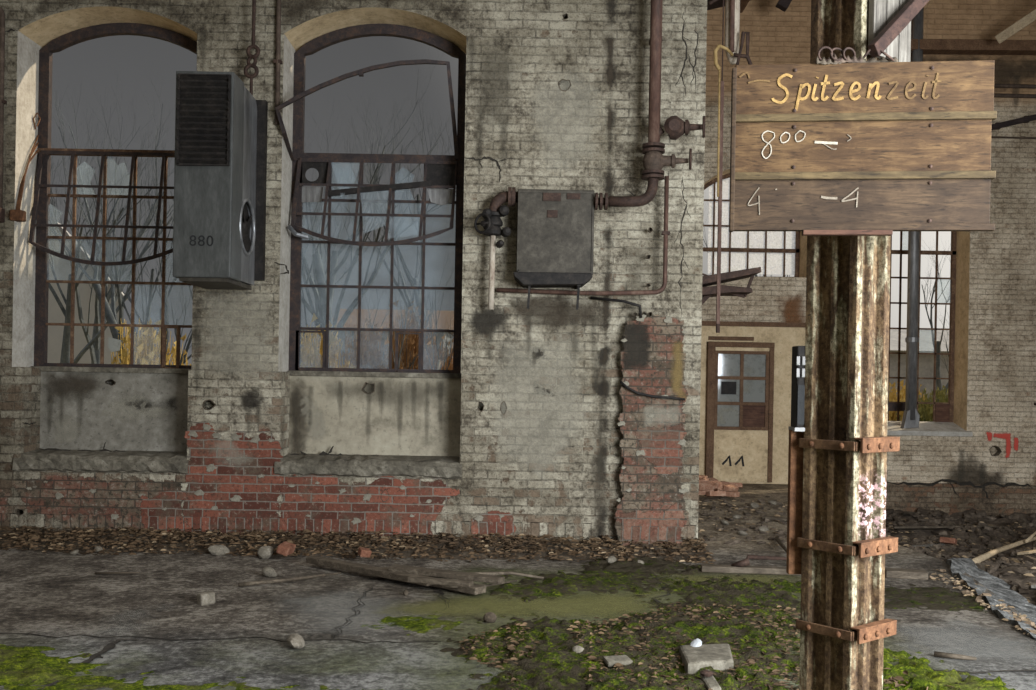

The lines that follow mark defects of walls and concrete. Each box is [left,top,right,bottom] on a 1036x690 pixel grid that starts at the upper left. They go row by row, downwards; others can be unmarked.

damp [48,375,95,395]
spalling [12,399,460,537]
damp [291,387,305,453]
peeling [614,314,689,546]